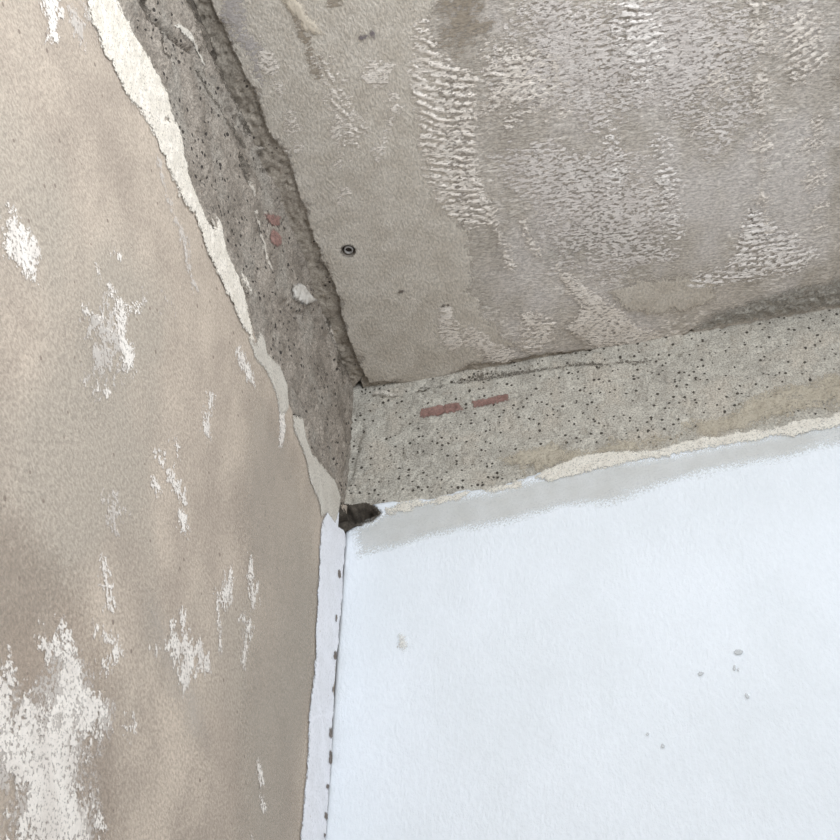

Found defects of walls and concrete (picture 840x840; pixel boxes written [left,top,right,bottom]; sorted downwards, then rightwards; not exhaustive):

peeling [1,202,42,285]
spalling [40,0,840,539]